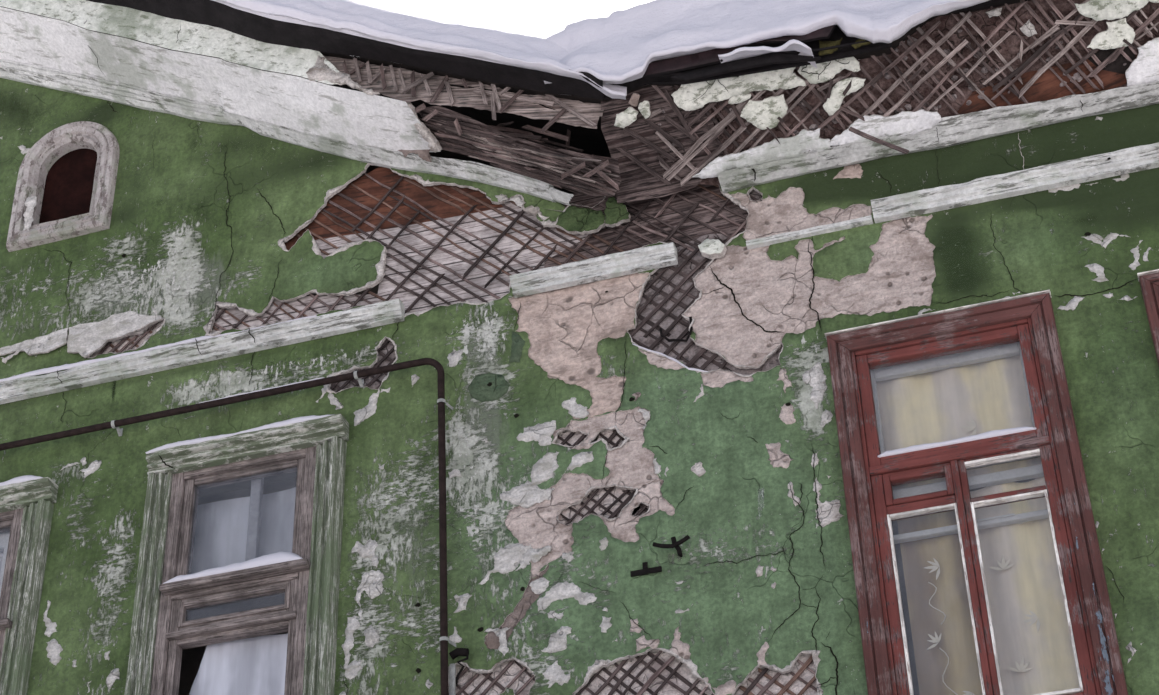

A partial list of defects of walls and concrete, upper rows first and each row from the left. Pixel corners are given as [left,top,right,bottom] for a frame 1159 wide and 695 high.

spalling [306,55,380,95]
spalling [398,102,442,162]
peeling [1048,183,1096,193]
spalling [86,306,165,358]
crack [707,265,783,333]
crack [808,240,821,328]
crack [933,218,1136,305]
peeling [1058,296,1083,311]
peeling [1085,263,1137,301]
peeling [1084,233,1151,270]
spalling [203,163,936,695]
crack [704,444,838,695]